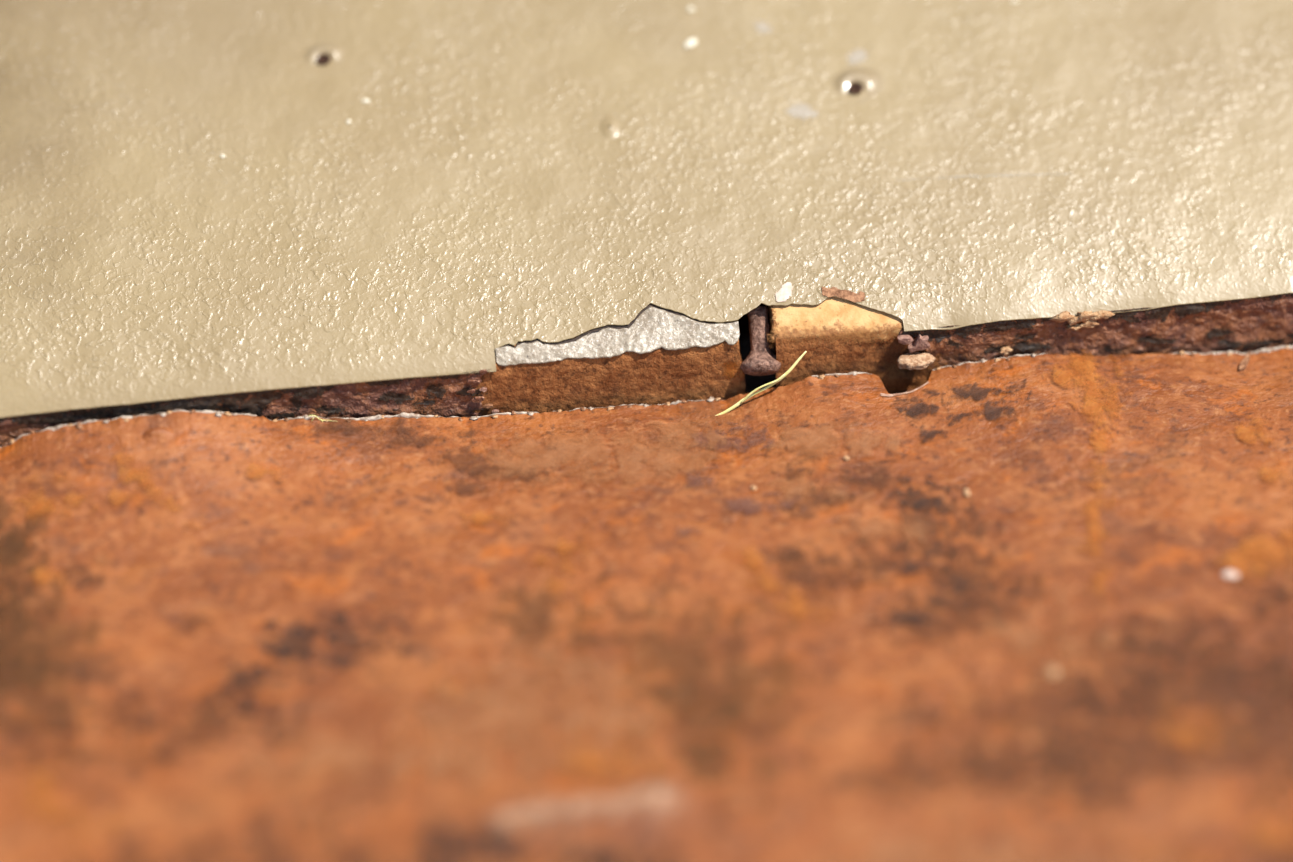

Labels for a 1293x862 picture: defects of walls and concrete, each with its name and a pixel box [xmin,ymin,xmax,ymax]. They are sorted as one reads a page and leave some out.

spalling [0,307,740,448]
spalling [769,282,1048,393]
corrosion [0,294,1293,862]